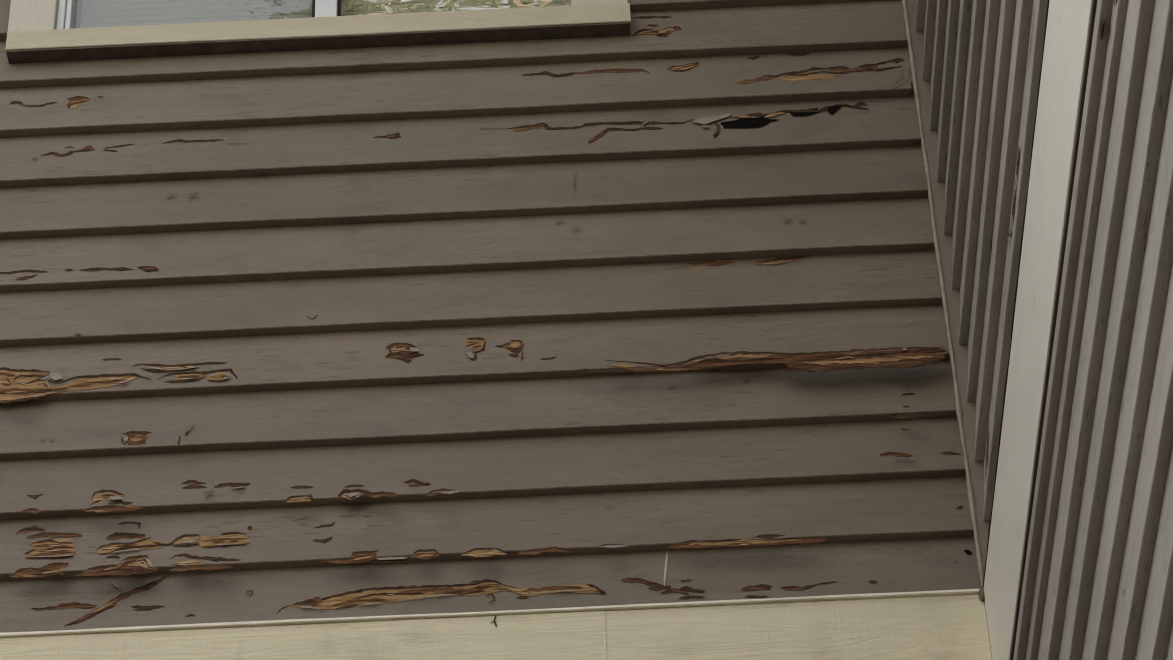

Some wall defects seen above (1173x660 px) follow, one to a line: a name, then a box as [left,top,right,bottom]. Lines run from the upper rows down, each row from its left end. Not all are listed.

peeling [692,114,730,127]
peeling [385,343,424,363]
peeling [465,337,524,361]
peeling [0,358,238,405]
peeling [338,485,397,503]
peeling [81,489,250,558]
peeling [15,525,82,559]
peeling [31,575,170,626]
peeling [277,579,606,613]
peeling [621,577,705,599]